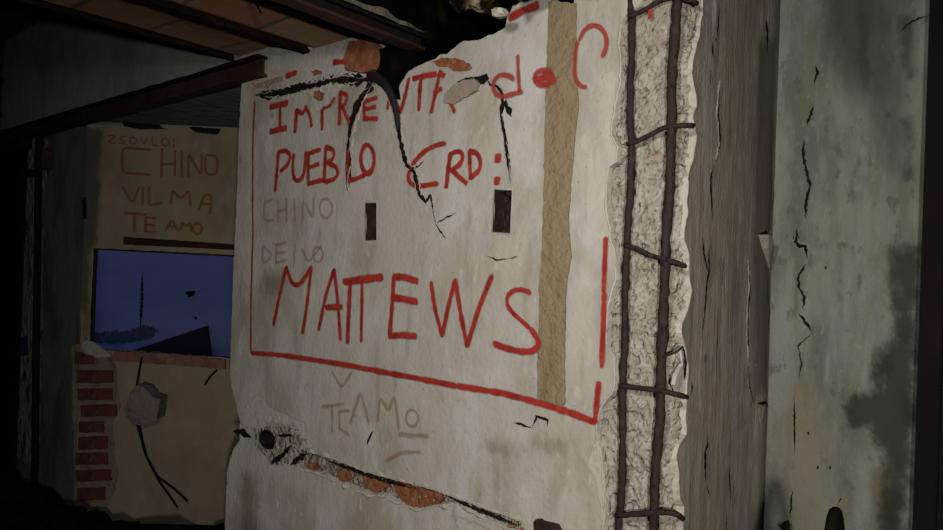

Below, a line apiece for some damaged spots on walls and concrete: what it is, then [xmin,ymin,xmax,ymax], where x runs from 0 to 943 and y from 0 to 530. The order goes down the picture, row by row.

flaking render [449,0,513,15]
flaking render [71,325,160,509]
crack [255,71,456,237]
flaking render [241,395,522,530]
crack [487,80,512,182]
spalling [587,0,719,530]
crack [702,80,724,365]
crack [746,260,770,403]
crack [790,398,798,453]
crack [792,107,814,376]
water stain [845,247,921,530]